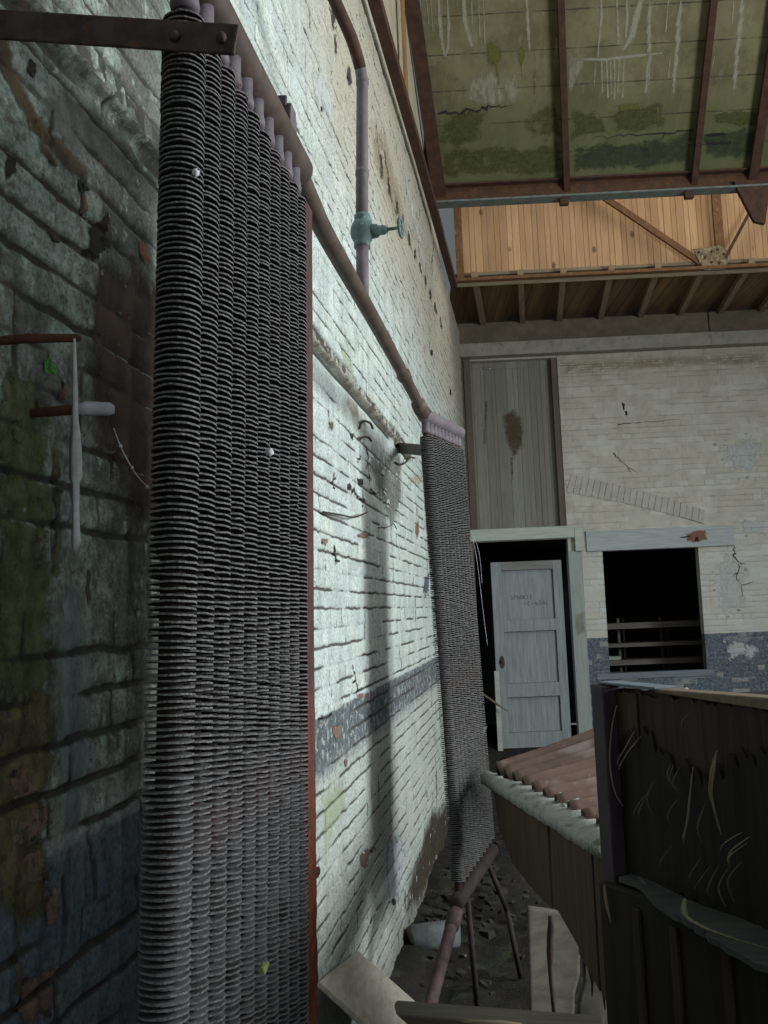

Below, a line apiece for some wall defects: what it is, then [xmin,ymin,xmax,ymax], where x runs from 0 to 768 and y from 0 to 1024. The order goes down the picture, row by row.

leakage [426,0,485,57]
leakage [580,0,682,100]
leakage [731,0,744,89]
crack [438,104,512,116]
crack [592,129,693,140]
leakage [504,411,523,474]
rust [680,530,708,542]
crack [733,546,754,596]
peeling [723,640,756,664]